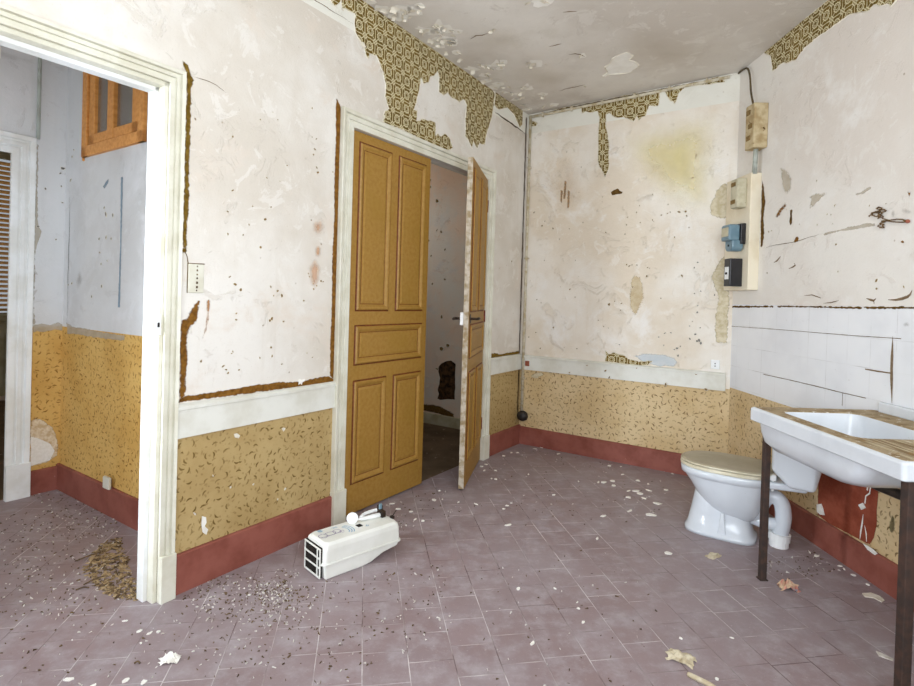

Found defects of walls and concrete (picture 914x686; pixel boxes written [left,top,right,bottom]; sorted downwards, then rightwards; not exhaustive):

peeling [366,0,559,111]
spalling [760,182,772,247]
flaking render [608,264,650,313]
crack [733,326,901,402]
spalling [30,419,58,466]